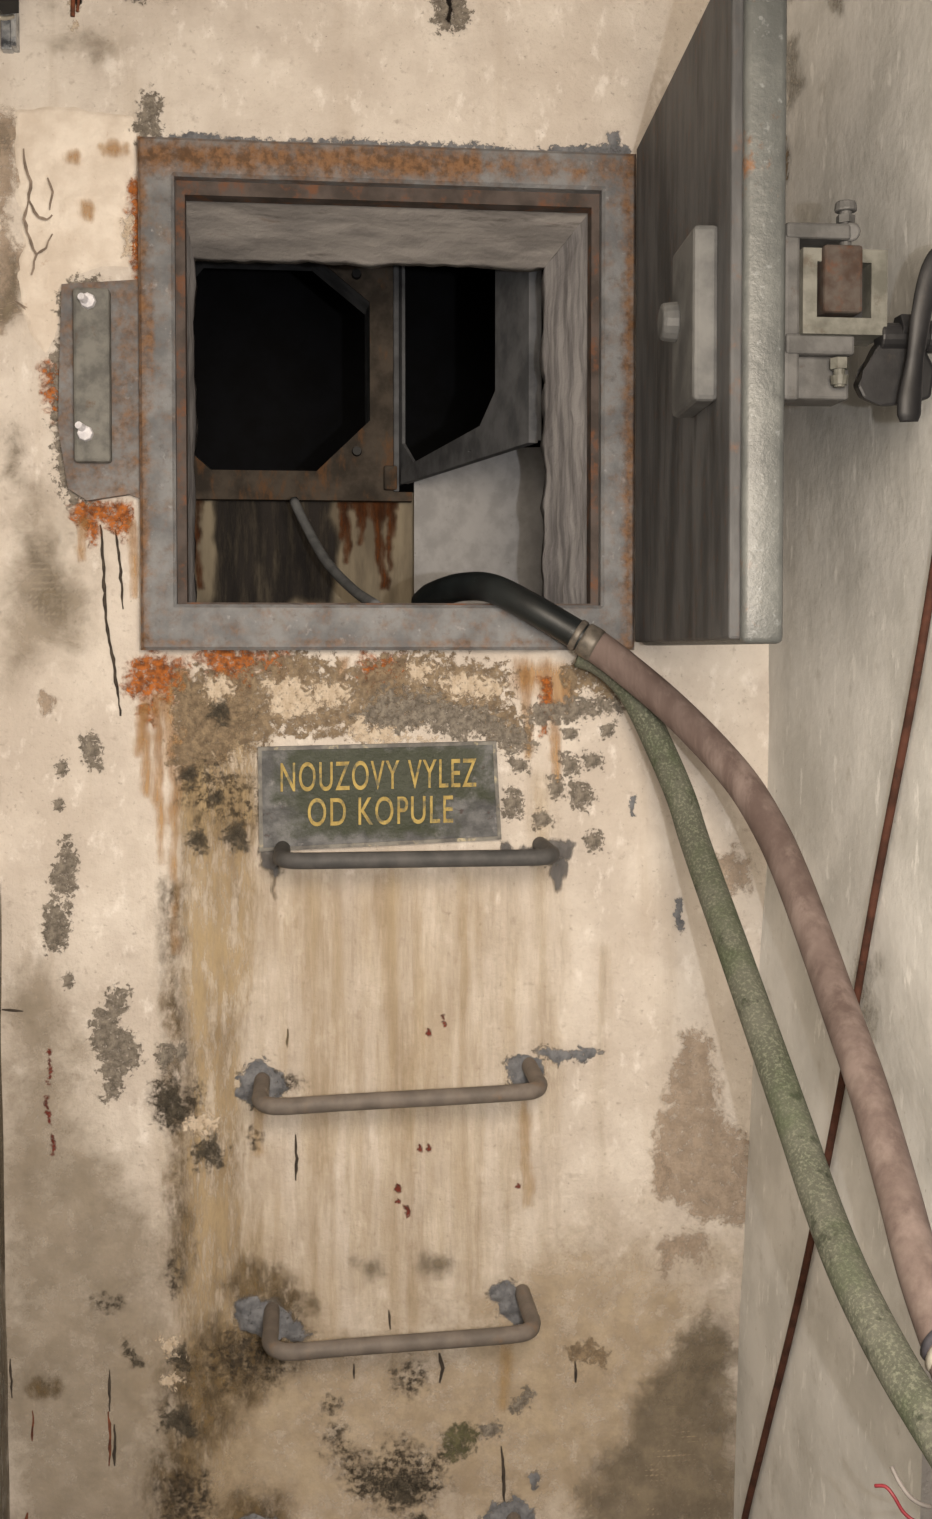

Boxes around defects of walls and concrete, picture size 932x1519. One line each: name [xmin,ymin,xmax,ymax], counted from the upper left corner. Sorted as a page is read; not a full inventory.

hole [429,0,475,36]
crack [1,149,54,321]
corrosion [69,500,137,593]
crack [100,525,124,716]
corrosion [124,650,303,831]
corrosion [518,664,572,783]
peeling [41,834,81,956]
peeling [61,972,74,991]
peeling [88,983,146,1105]
damp [0,696,737,1519]